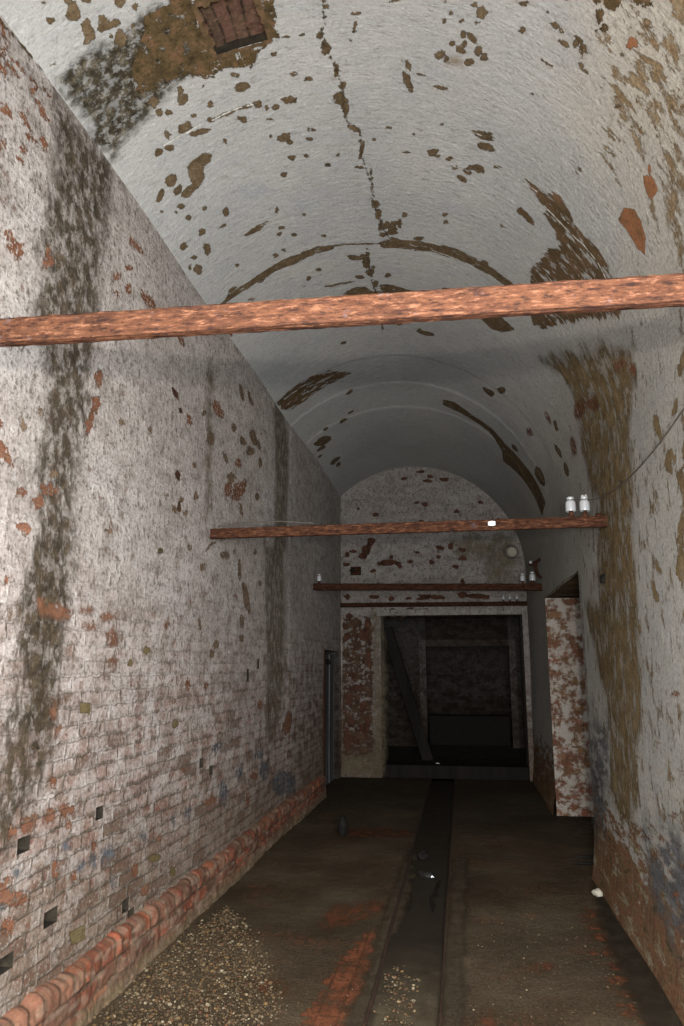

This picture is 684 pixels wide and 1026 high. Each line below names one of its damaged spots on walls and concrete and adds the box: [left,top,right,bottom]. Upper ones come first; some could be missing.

damp [39,0,190,316]
peeling [156,152,212,275]
peeling [46,0,332,157]
peeling [333,64,376,169]
crack [220,0,512,304]
spalling [618,207,646,255]
crack [531,315,544,326]
spalling [171,387,262,518]
peeling [653,415,684,585]
damp [0,342,93,847]
damp [647,829,684,932]
damp [596,896,683,1026]